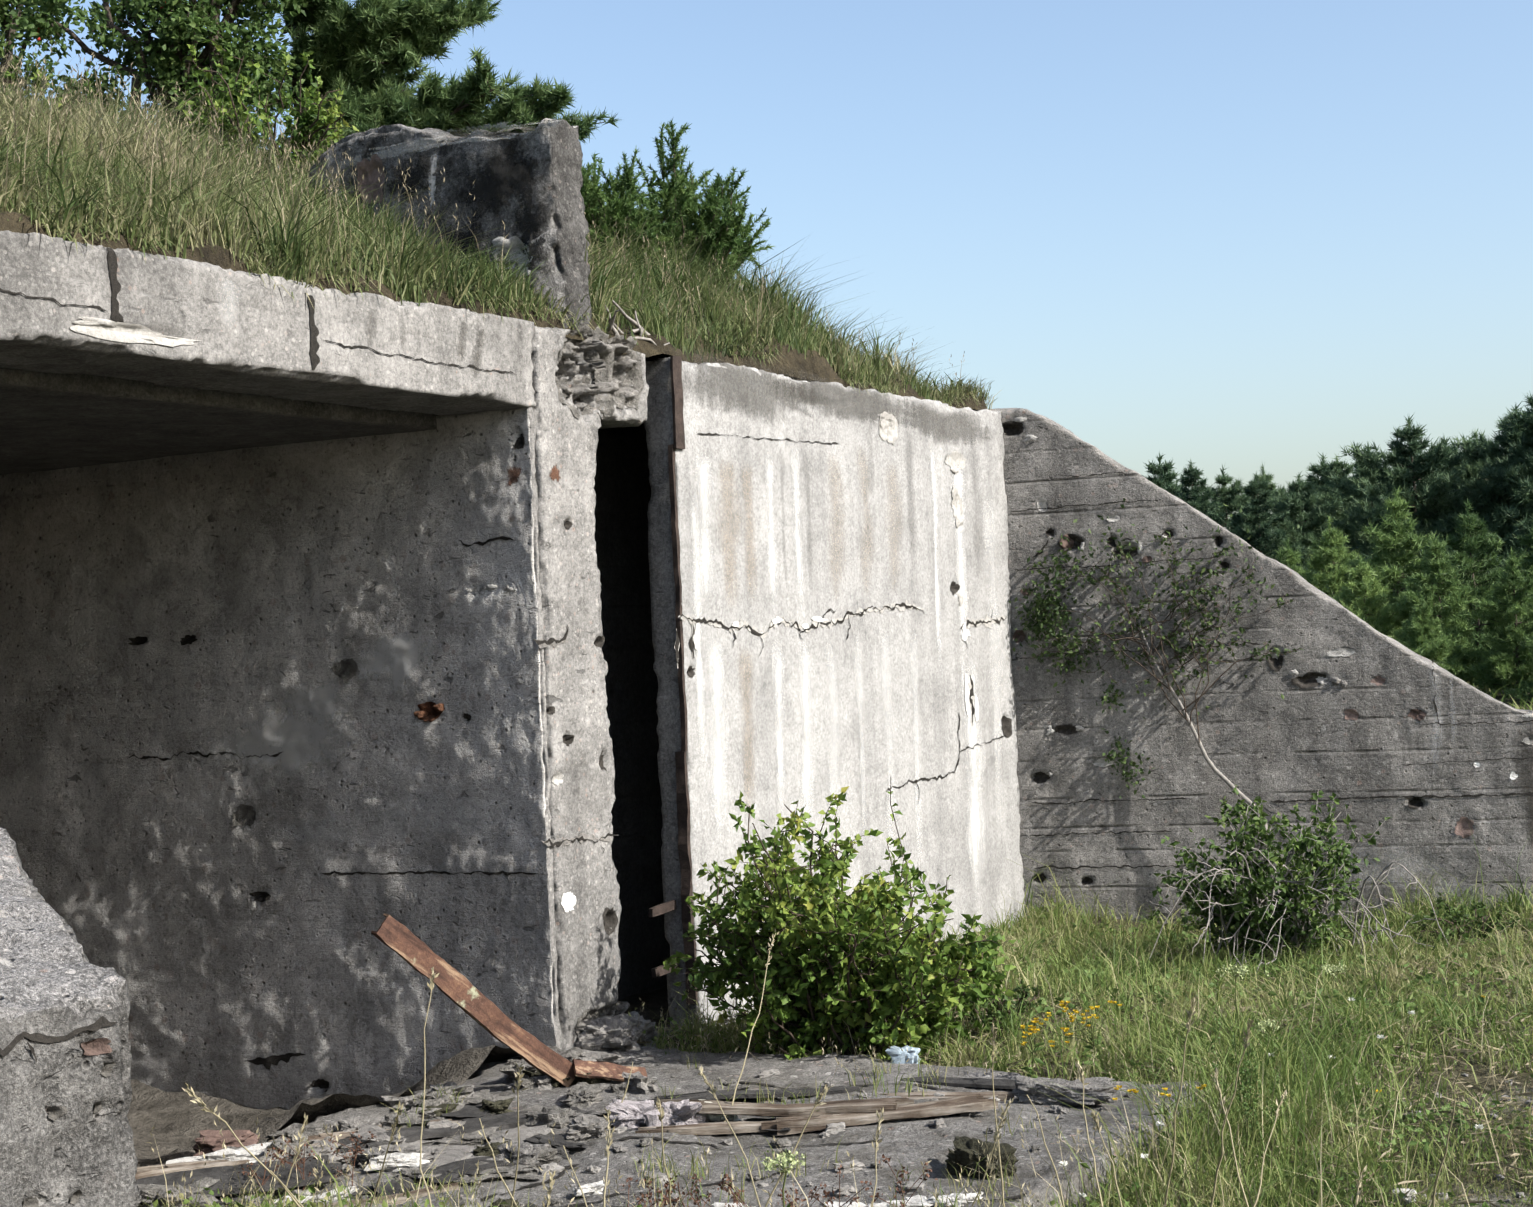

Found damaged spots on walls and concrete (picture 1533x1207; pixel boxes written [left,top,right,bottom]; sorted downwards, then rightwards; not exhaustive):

crack [0,288,106,311]
crack [323,340,514,374]
spalling [555,322,644,420]
leakage [692,461,710,625]
leakage [793,454,801,581]
efflorescence [930,455,967,638]
crack [674,599,926,668]
leakage [696,648,725,821]
leakage [773,651,783,787]
crack [888,610,1008,802]
efflorescence [962,673,985,875]
crack [322,832,619,876]